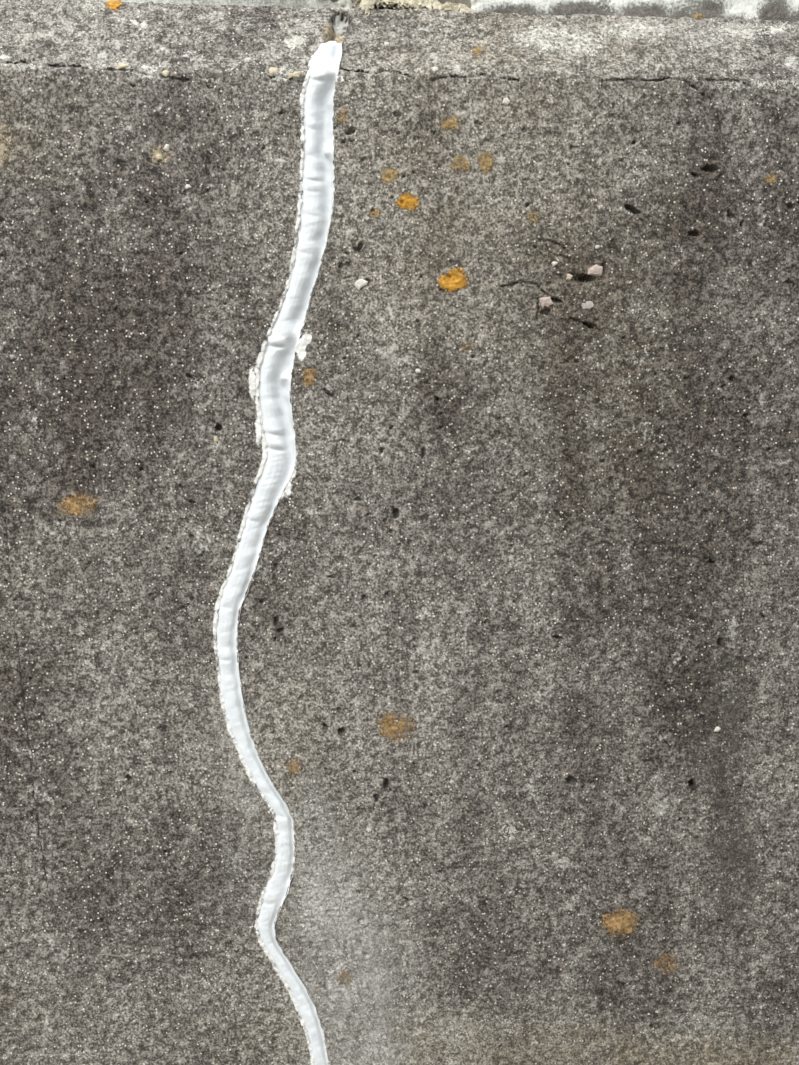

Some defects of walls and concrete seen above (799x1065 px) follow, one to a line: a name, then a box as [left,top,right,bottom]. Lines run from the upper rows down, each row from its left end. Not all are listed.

crack [2,60,212,88]
crack [438,73,519,81]
crack [604,77,747,88]
crack [213,13,411,1065]